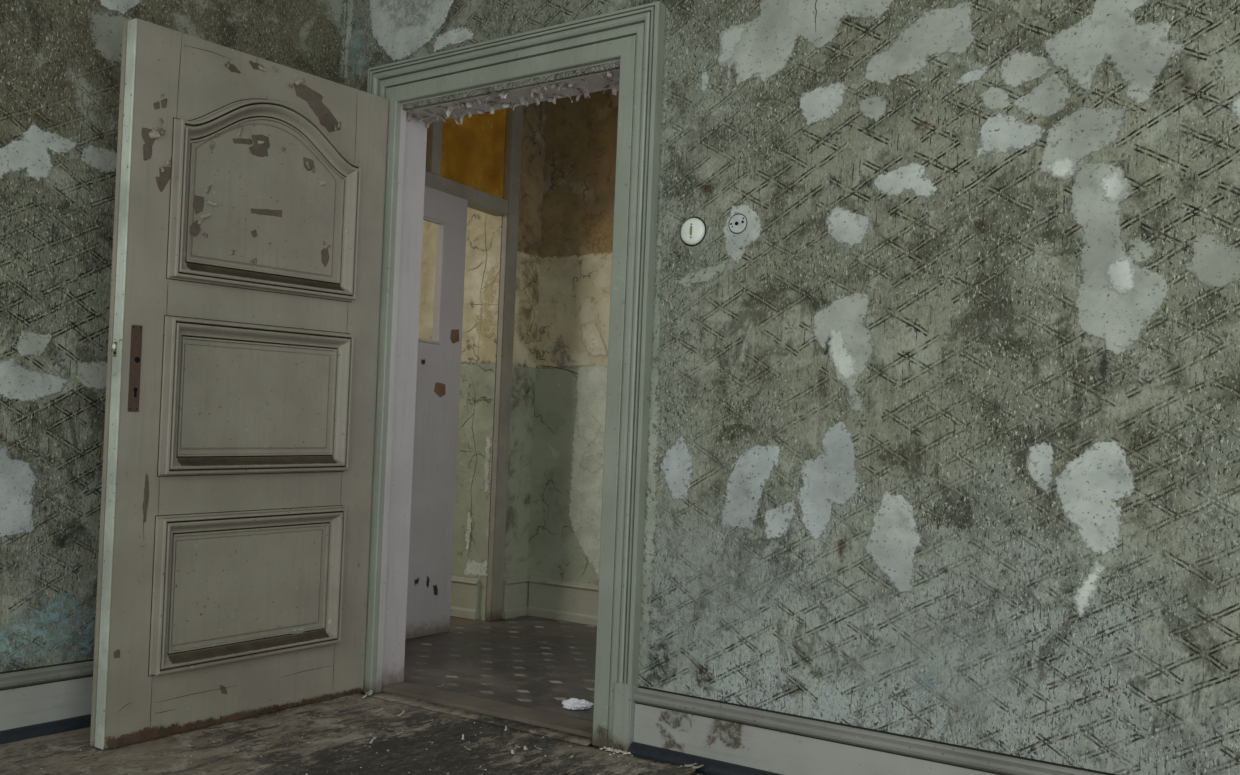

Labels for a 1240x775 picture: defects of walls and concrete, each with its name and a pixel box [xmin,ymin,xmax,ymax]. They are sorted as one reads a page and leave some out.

peeling [290,79,342,132]
flaking render [369,0,474,61]
flaking render [718,0,893,85]
flaking render [799,81,847,125]
flaking render [858,0,976,123]
flaking render [0,124,117,181]
flaking render [956,0,1185,374]
flaking render [0,330,107,402]
flaking render [721,292,874,540]
flaking render [0,445,36,538]
flaking render [864,491,922,592]
flaking render [1026,441,1135,617]